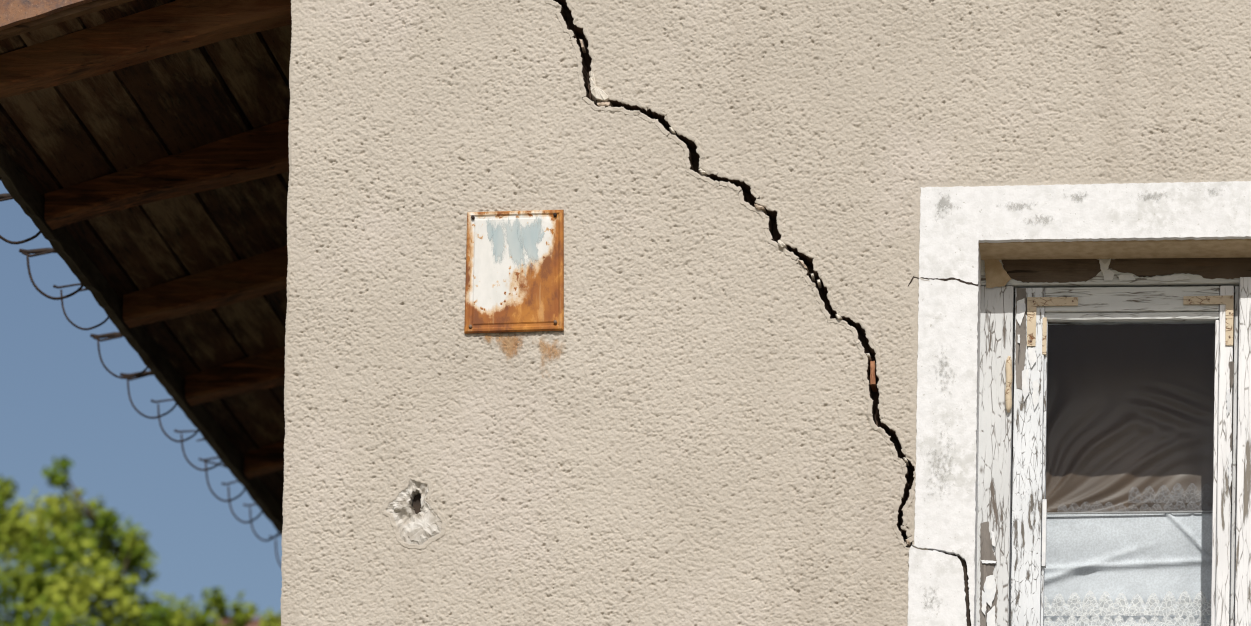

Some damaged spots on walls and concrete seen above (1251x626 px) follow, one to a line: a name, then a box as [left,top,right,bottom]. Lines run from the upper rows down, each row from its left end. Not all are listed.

corrosion [485,334,519,355]
crack [545,0,978,626]
peeling [984,257,1251,416]
spalling [381,474,447,550]
peeling [979,521,998,626]